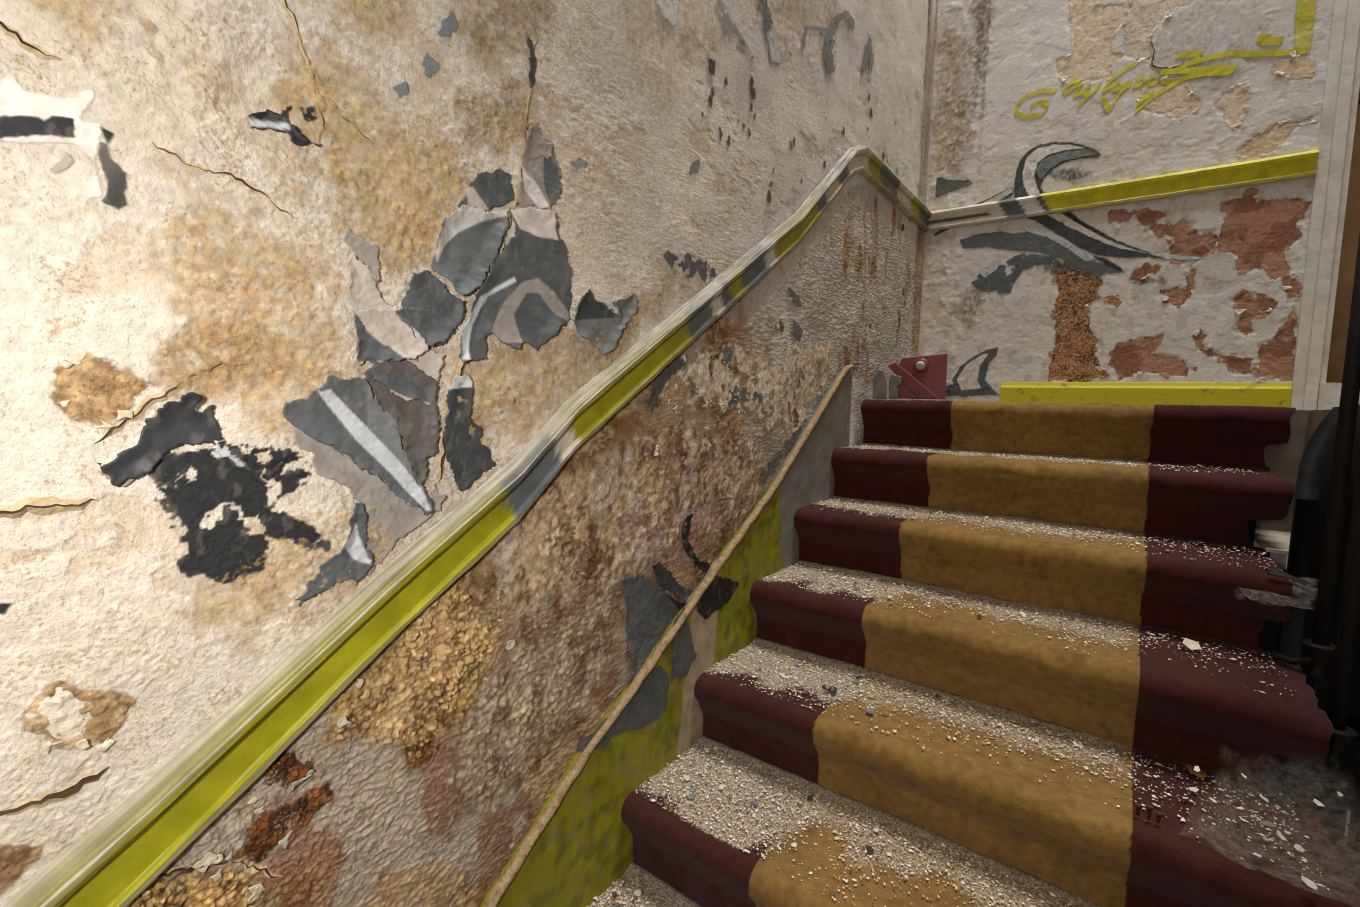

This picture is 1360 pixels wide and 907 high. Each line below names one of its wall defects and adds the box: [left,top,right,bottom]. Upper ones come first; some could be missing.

crack [0,21,62,61]
peeling [0,77,126,209]
damp [277,61,465,265]
damp [457,82,534,152]
damp [155,208,339,433]
peeling [52,122,638,606]
spalling [1048,188,1312,382]
crack [0,496,99,519]
spalling [321,287,834,824]
crack [0,765,109,816]
corrosion [221,751,333,863]
corrosion [404,730,440,769]